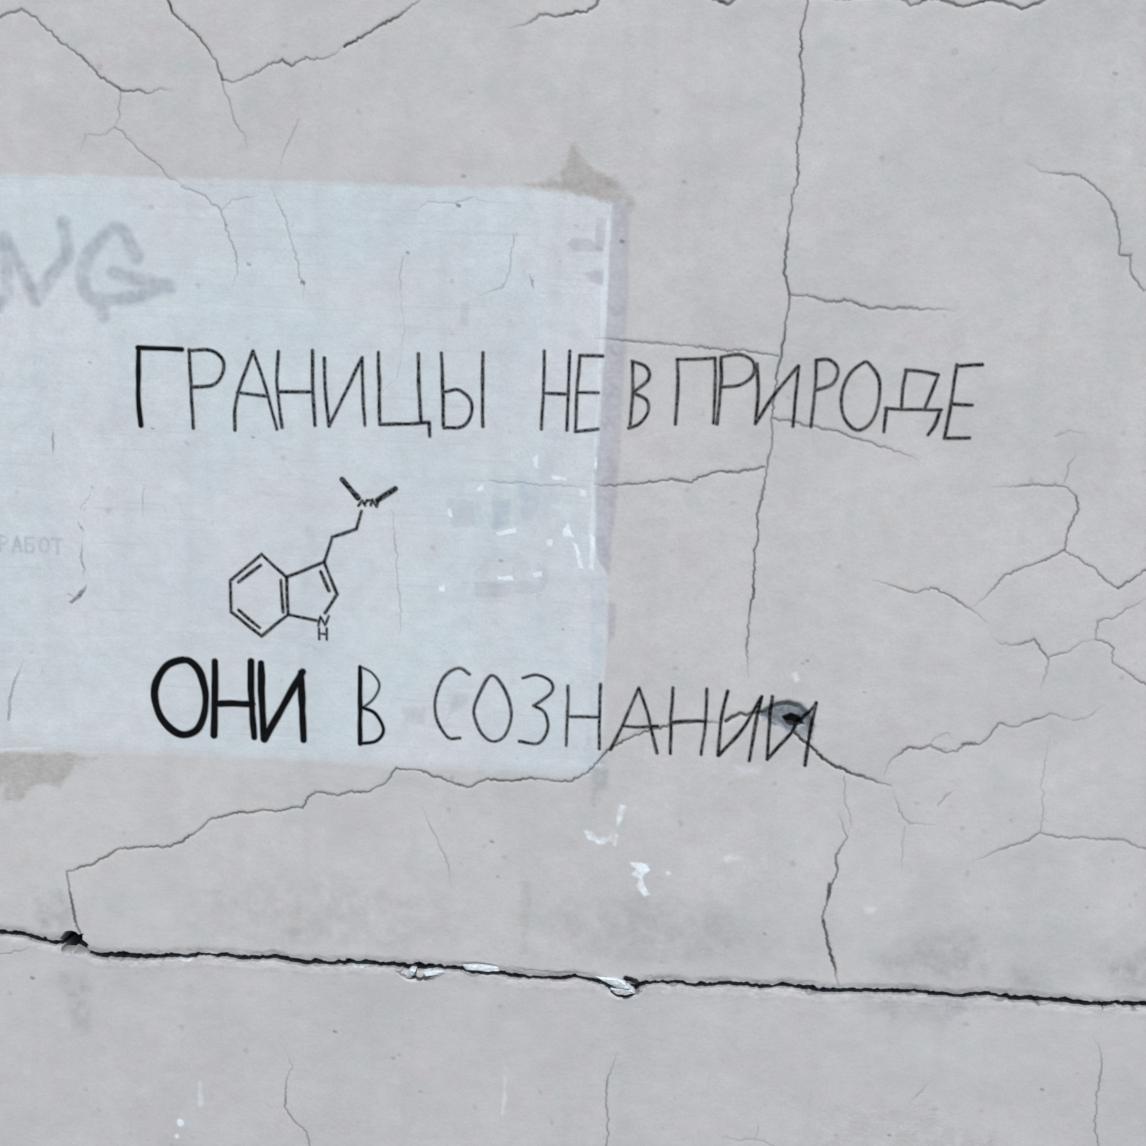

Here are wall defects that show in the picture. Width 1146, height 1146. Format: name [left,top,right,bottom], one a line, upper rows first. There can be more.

crack [165,0,422,150]
crack [892,0,1047,12]
crack [0,7,305,304]
crack [1024,161,1146,293]
crack [372,257,406,404]
crack [469,0,957,678]
crack [0,429,1146,1146]